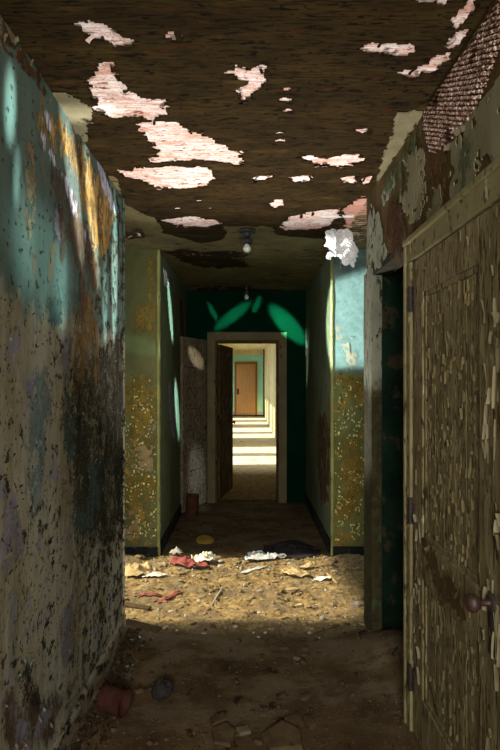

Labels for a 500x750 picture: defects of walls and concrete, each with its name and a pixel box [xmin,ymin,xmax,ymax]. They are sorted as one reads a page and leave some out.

flaking render [0,19,244,190]
flaking render [224,65,267,103]
flaking render [279,208,344,231]
flaking render [288,154,365,183]
flaking render [341,0,500,208]
damp [25,111,123,566]
peeling [335,326,357,371]
peeling [403,273,500,750]